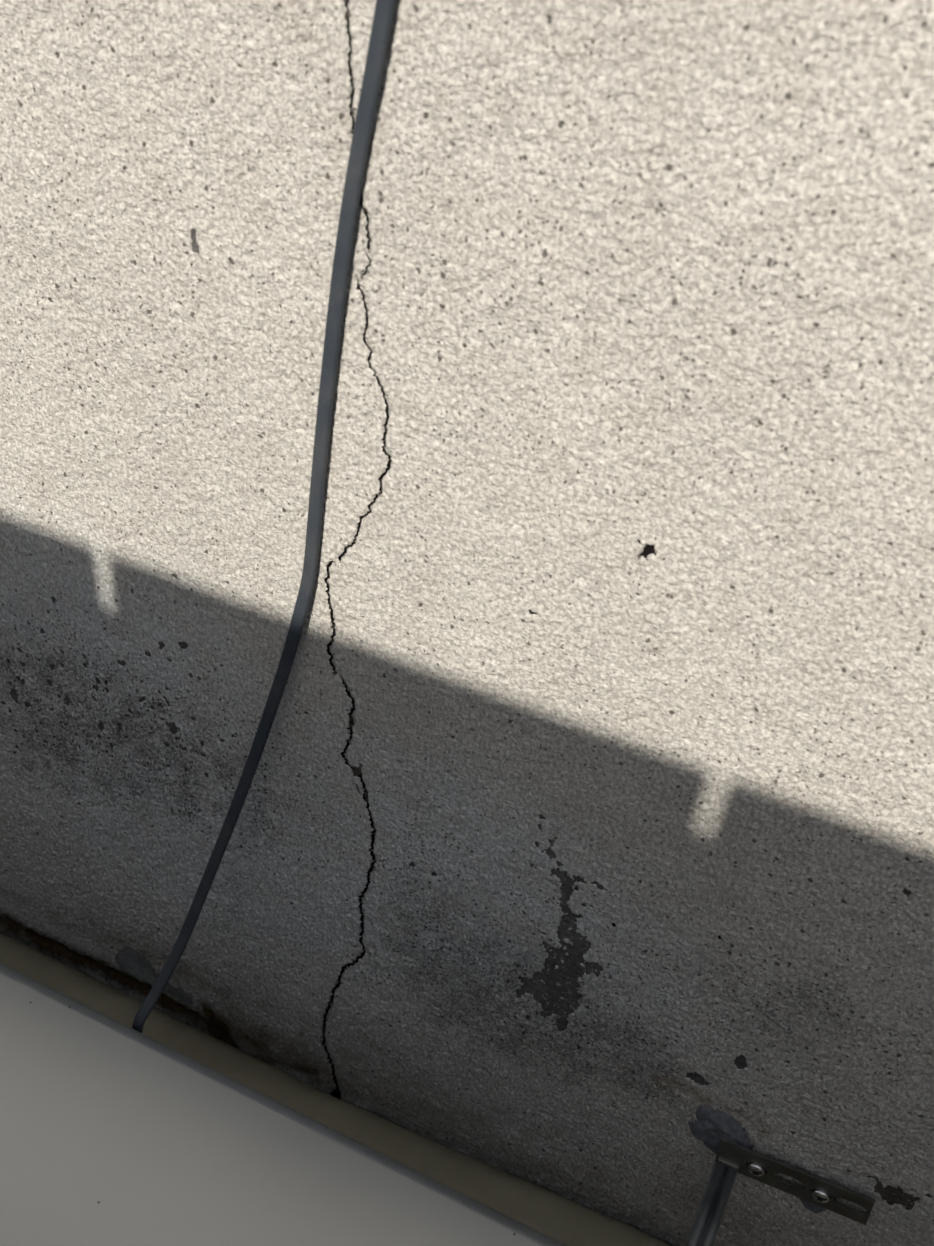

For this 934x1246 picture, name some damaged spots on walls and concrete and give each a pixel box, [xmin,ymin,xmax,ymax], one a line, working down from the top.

crack [344,0,354,136]
crack [322,196,391,1100]
peeling [867,1176,933,1210]